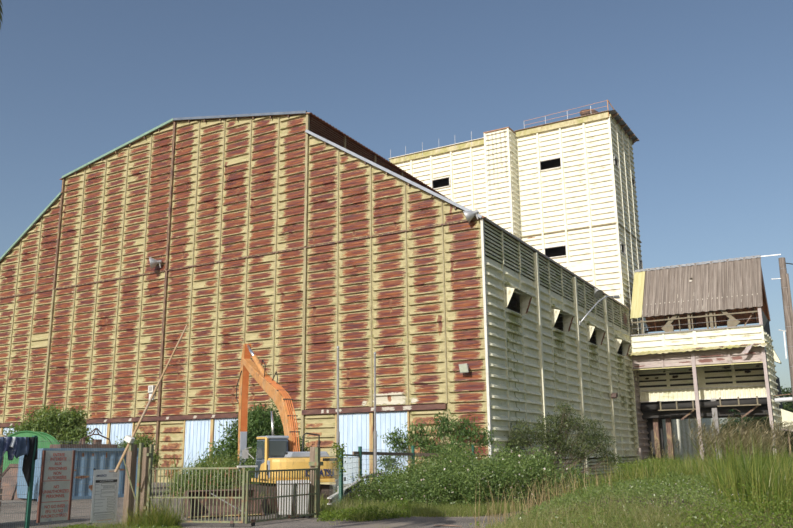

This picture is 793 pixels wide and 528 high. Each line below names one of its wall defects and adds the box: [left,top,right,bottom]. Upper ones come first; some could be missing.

rust [135,425,183,476]
rust [0,117,488,466]